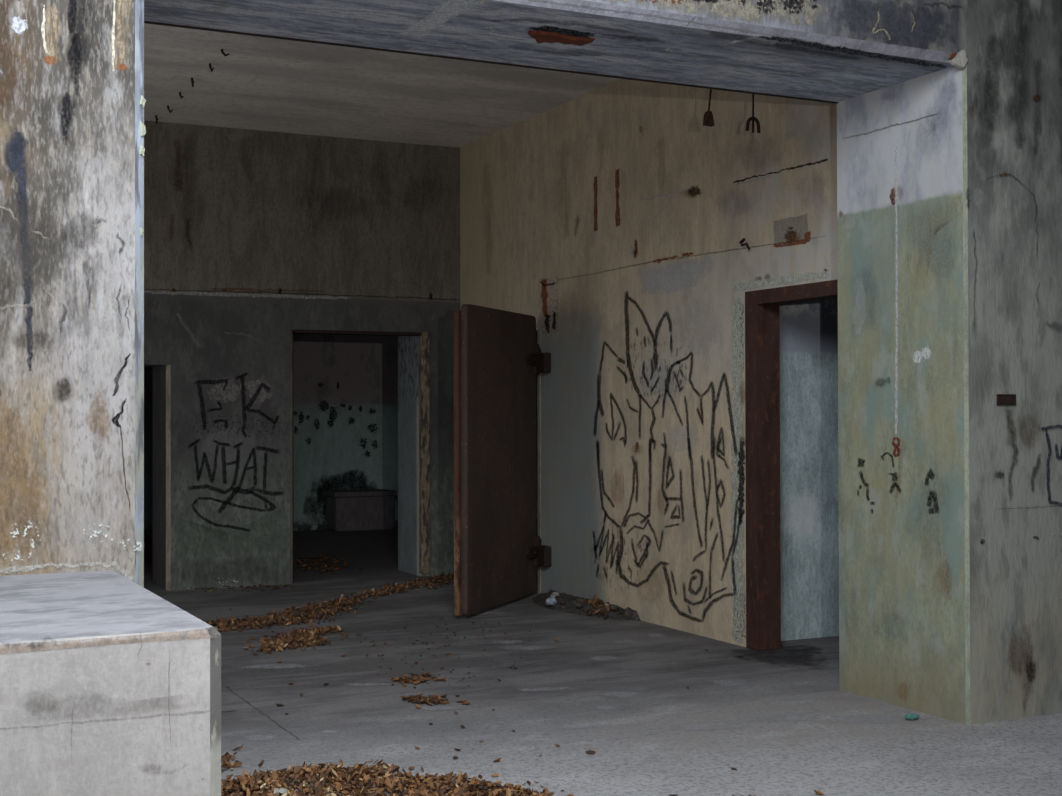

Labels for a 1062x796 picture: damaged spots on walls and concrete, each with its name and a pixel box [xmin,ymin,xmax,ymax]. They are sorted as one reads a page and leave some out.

leakage [60,0,82,141]
crack [734,159,828,185]
leakage [6,132,33,371]
crack [112,353,131,508]
leakage [2,520,41,561]